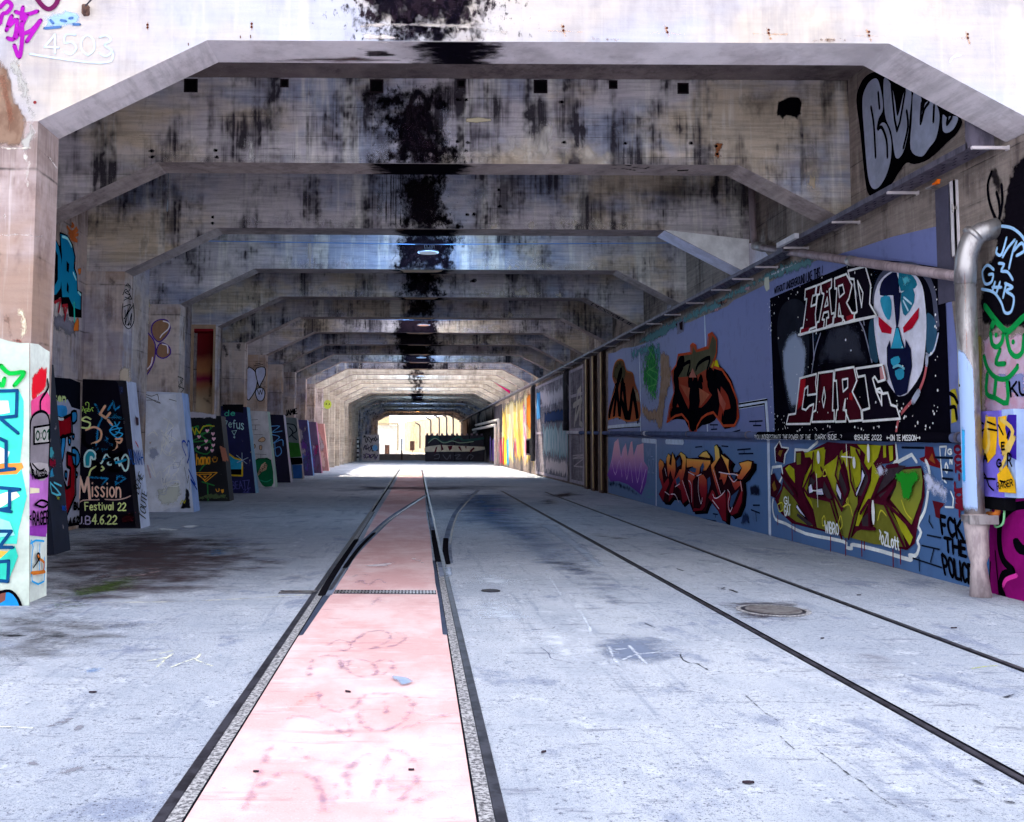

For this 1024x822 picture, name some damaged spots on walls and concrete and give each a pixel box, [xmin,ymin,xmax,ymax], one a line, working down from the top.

peeling [0,61,35,186]
water stain [47,533,273,600]